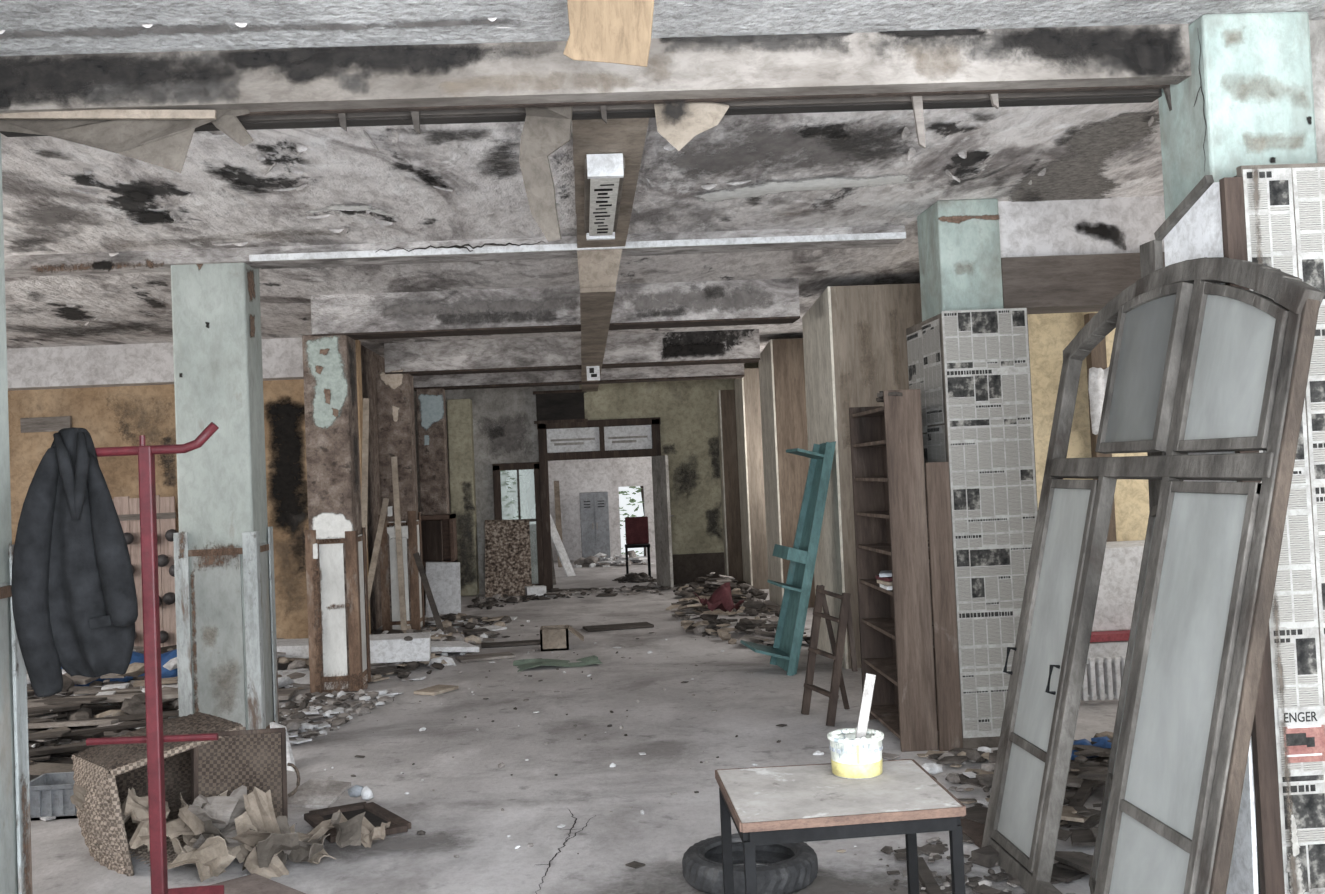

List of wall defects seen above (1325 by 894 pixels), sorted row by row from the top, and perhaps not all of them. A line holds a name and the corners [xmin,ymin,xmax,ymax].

leakage [0,44,523,109]
leakage [661,33,852,51]
leakage [879,26,1186,76]
leakage [1076,222,1126,250]
peeling [307,336,348,428]
leakage [265,397,308,598]
corrosion [178,532,239,713]